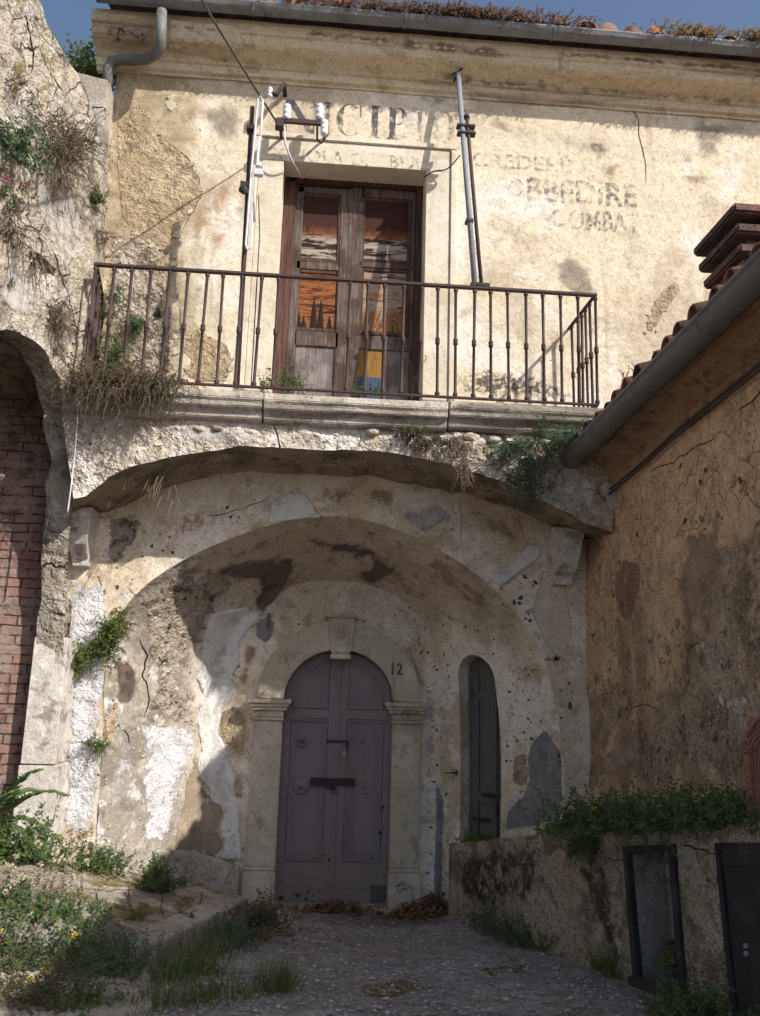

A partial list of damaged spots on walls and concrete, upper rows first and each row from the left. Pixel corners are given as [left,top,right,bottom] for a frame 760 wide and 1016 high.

flaking render [105,92,235,384]
leakage [562,261,590,292]
crack [653,438,714,471]
crack [213,493,271,523]
flaking render [100,510,203,589]
crack [117,638,154,741]
flaking render [64,575,260,864]
leakage [462,850,543,908]